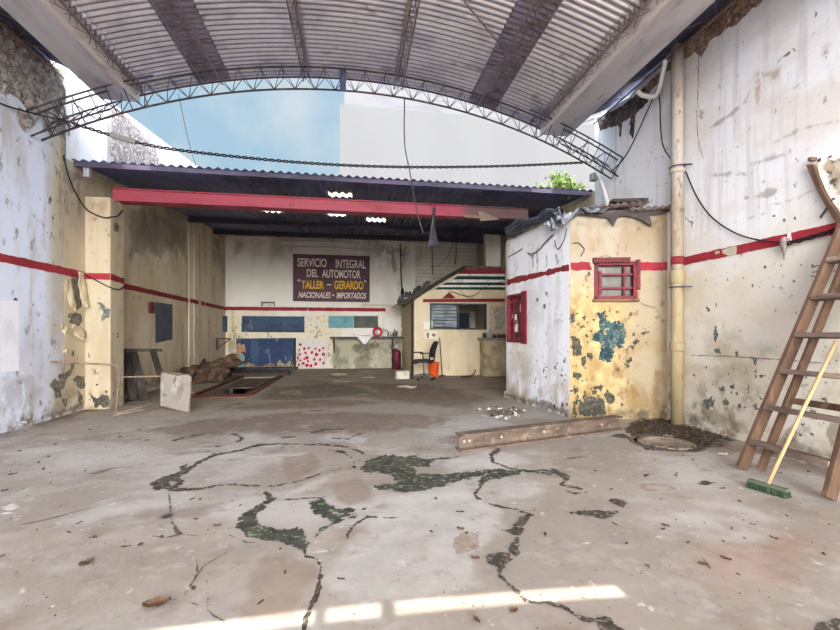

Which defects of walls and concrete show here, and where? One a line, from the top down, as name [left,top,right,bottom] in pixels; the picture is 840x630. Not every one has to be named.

flaking render [682,0,763,59]
flaking render [0,15,64,132]
flaking render [597,60,671,139]
damp [740,51,791,115]
flaking render [110,109,161,166]
damp [710,149,795,179]
peeling [61,271,110,340]
spalling [49,347,110,410]
peeling [535,305,655,418]
crack [149,428,399,630]
crack [473,448,624,630]